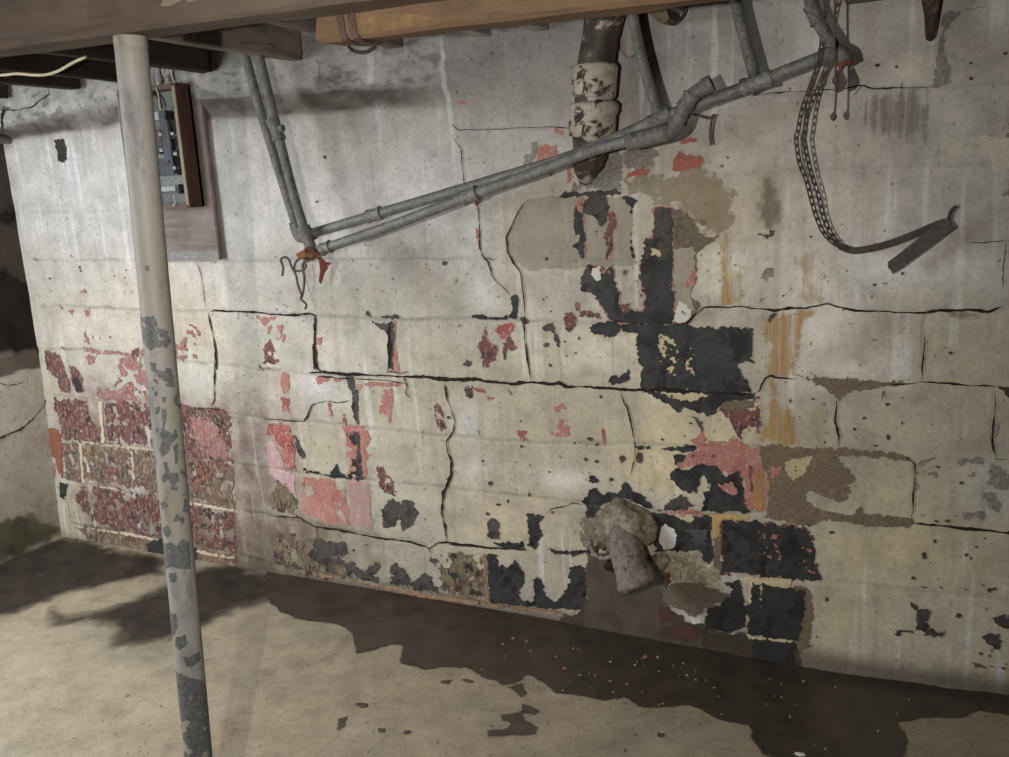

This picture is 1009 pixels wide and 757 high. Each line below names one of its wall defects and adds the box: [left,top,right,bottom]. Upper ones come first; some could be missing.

water stain [0,270,39,352]
water stain [0,516,165,614]
water stain [56,587,172,645]
peeling [44,316,239,583]
peeling [256,314,591,615]
crack [189,200,791,553]
water stain [196,551,1009,757]
peeling [542,166,945,666]
corrosion [764,256,820,389]
crack [679,240,1009,460]
crack [905,457,1009,535]
peeling [972,614,1009,670]